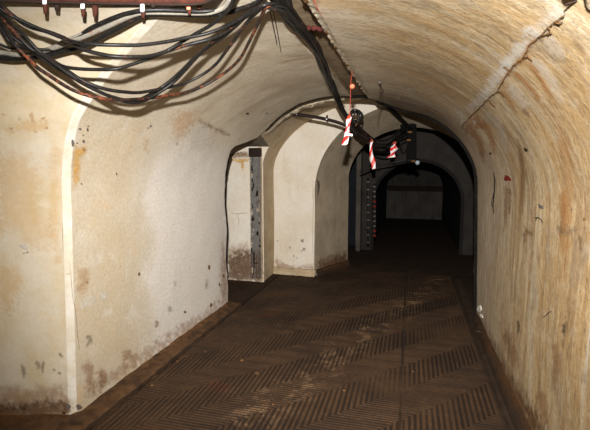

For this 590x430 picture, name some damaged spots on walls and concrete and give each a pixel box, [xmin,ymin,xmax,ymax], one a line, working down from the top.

crack [461,15,564,127]
leakage [0,400,70,424]